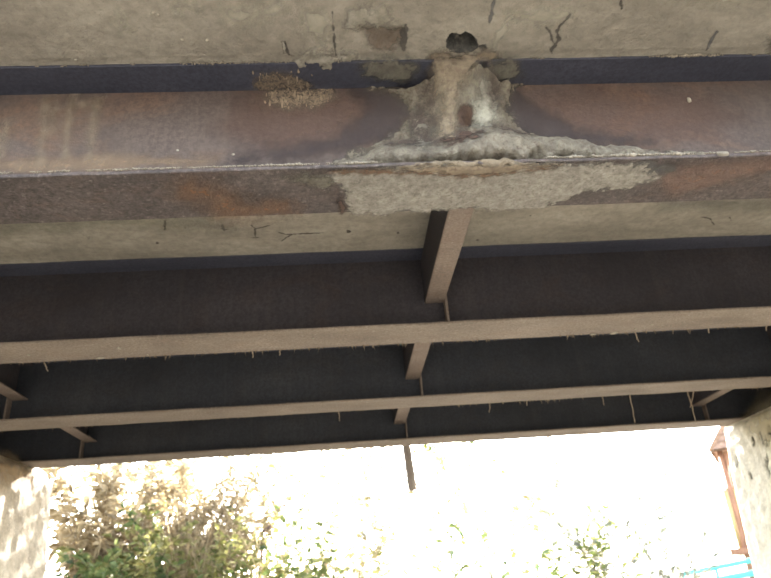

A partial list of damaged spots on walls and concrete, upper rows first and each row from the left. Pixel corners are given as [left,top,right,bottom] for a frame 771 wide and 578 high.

spalling [446,31,487,53]
crack [546,14,571,52]
spalling [456,104,473,127]
corrosion [0,156,207,174]
corrosion [665,159,771,193]